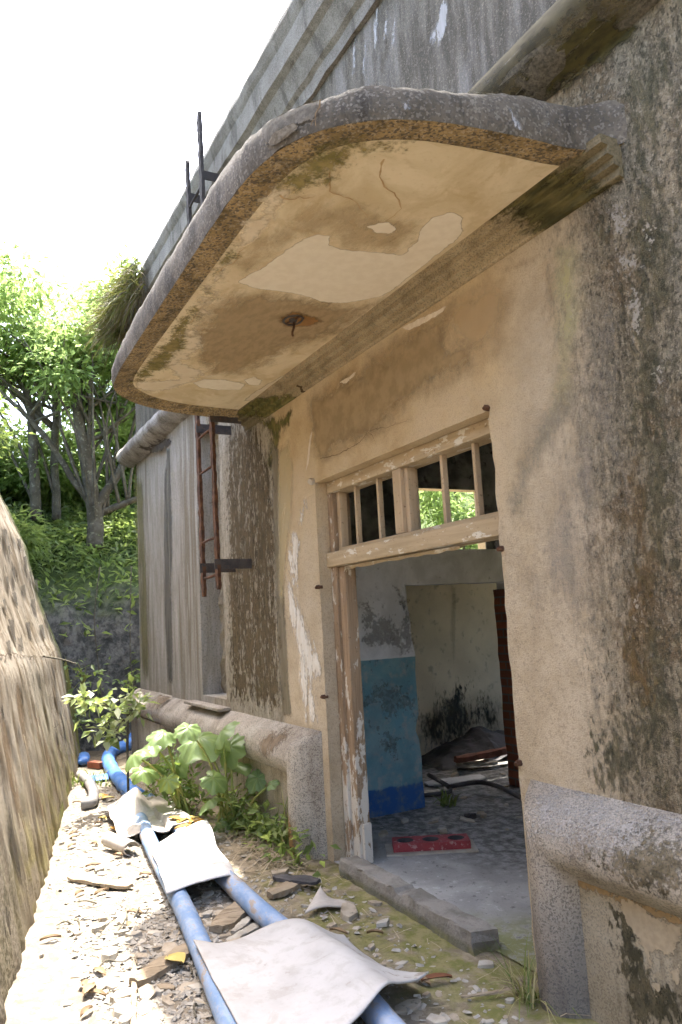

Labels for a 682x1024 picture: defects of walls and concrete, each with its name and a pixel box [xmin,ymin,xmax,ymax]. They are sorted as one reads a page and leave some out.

leakage [136,185,368,392]
peeling [239,213,463,303]
leakage [490,161,610,235]
leakage [311,320,469,457]
leakage [587,42,682,809]
leakage [225,423,321,759]
leakage [421,685,497,745]
peeling [619,899,682,997]